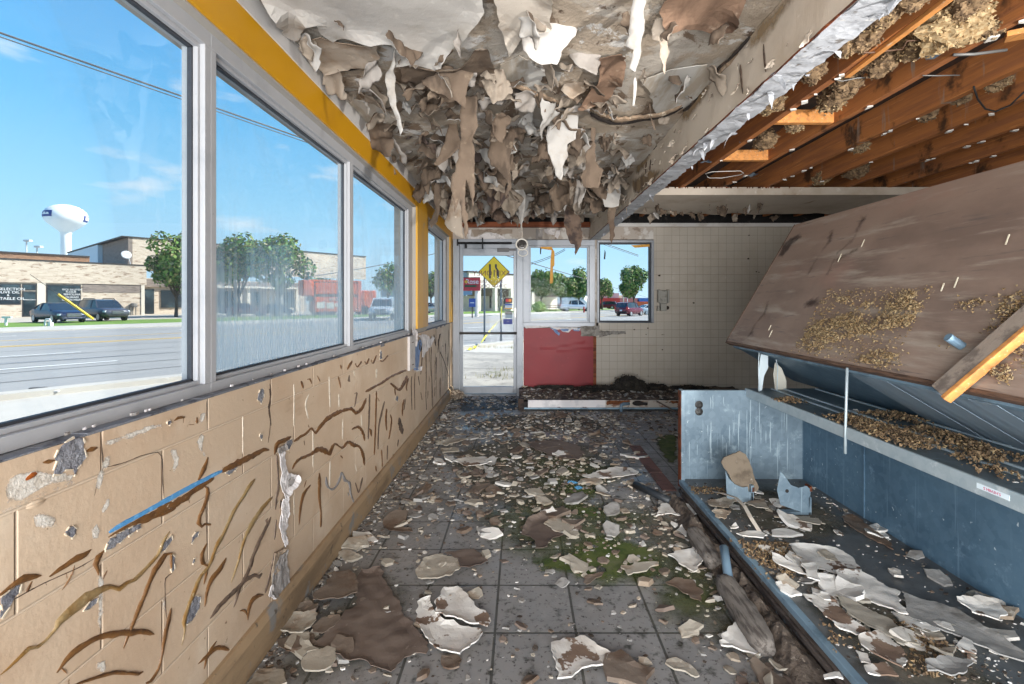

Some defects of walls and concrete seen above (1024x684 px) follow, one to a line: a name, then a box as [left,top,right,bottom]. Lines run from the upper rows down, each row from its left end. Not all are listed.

peeling [764,59,810,108]
peeling [261,0,753,255]
crack [265,384,273,442]
peeling [5,436,88,500]
crack [94,438,164,496]
spalling [92,499,142,552]
peeling [265,438,301,600]
crack [14,559,93,600]